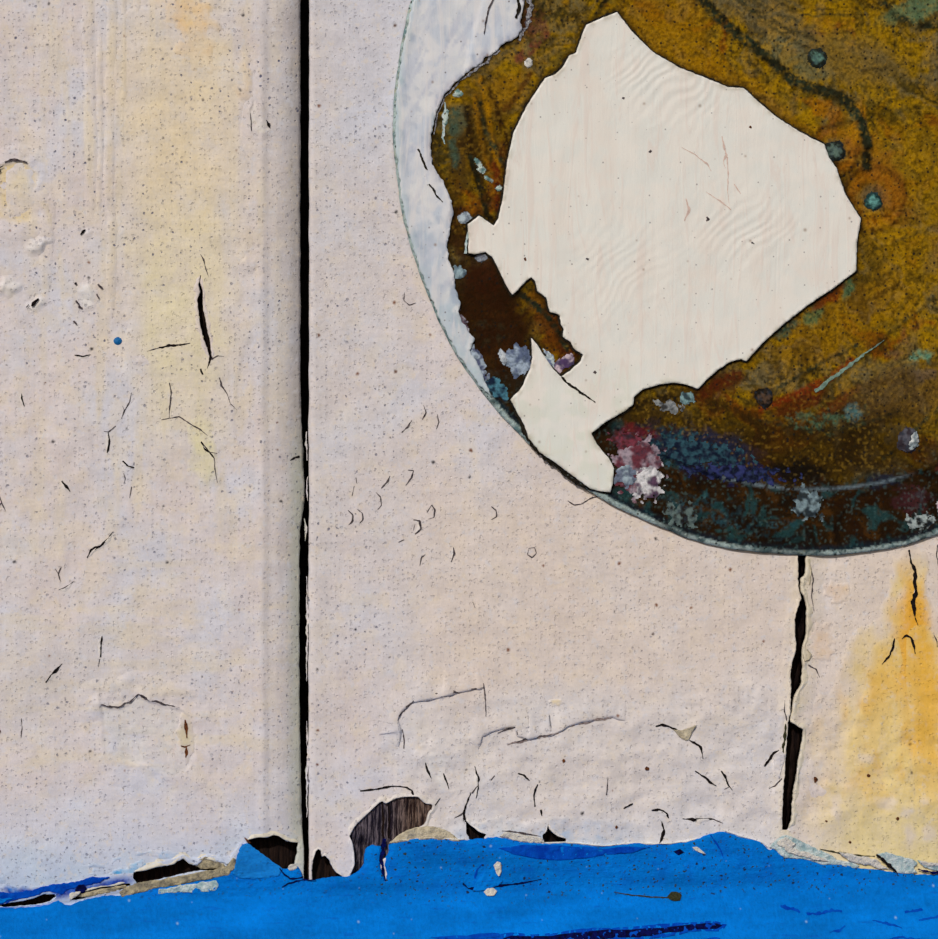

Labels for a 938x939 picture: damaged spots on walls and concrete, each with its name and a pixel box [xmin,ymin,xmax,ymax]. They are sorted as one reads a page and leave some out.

crack [149,254,237,410]
crack [162,383,218,483]
crack [882,545,938,664]
peeling [0,892,56,907]
peeling [69,669,626,900]
crack [518,773,542,816]
peeling [499,824,705,860]
crack [606,780,722,843]
crack [656,724,732,790]
crack [764,555,820,830]
peeling [723,830,938,875]
corrosion [769,549,938,875]